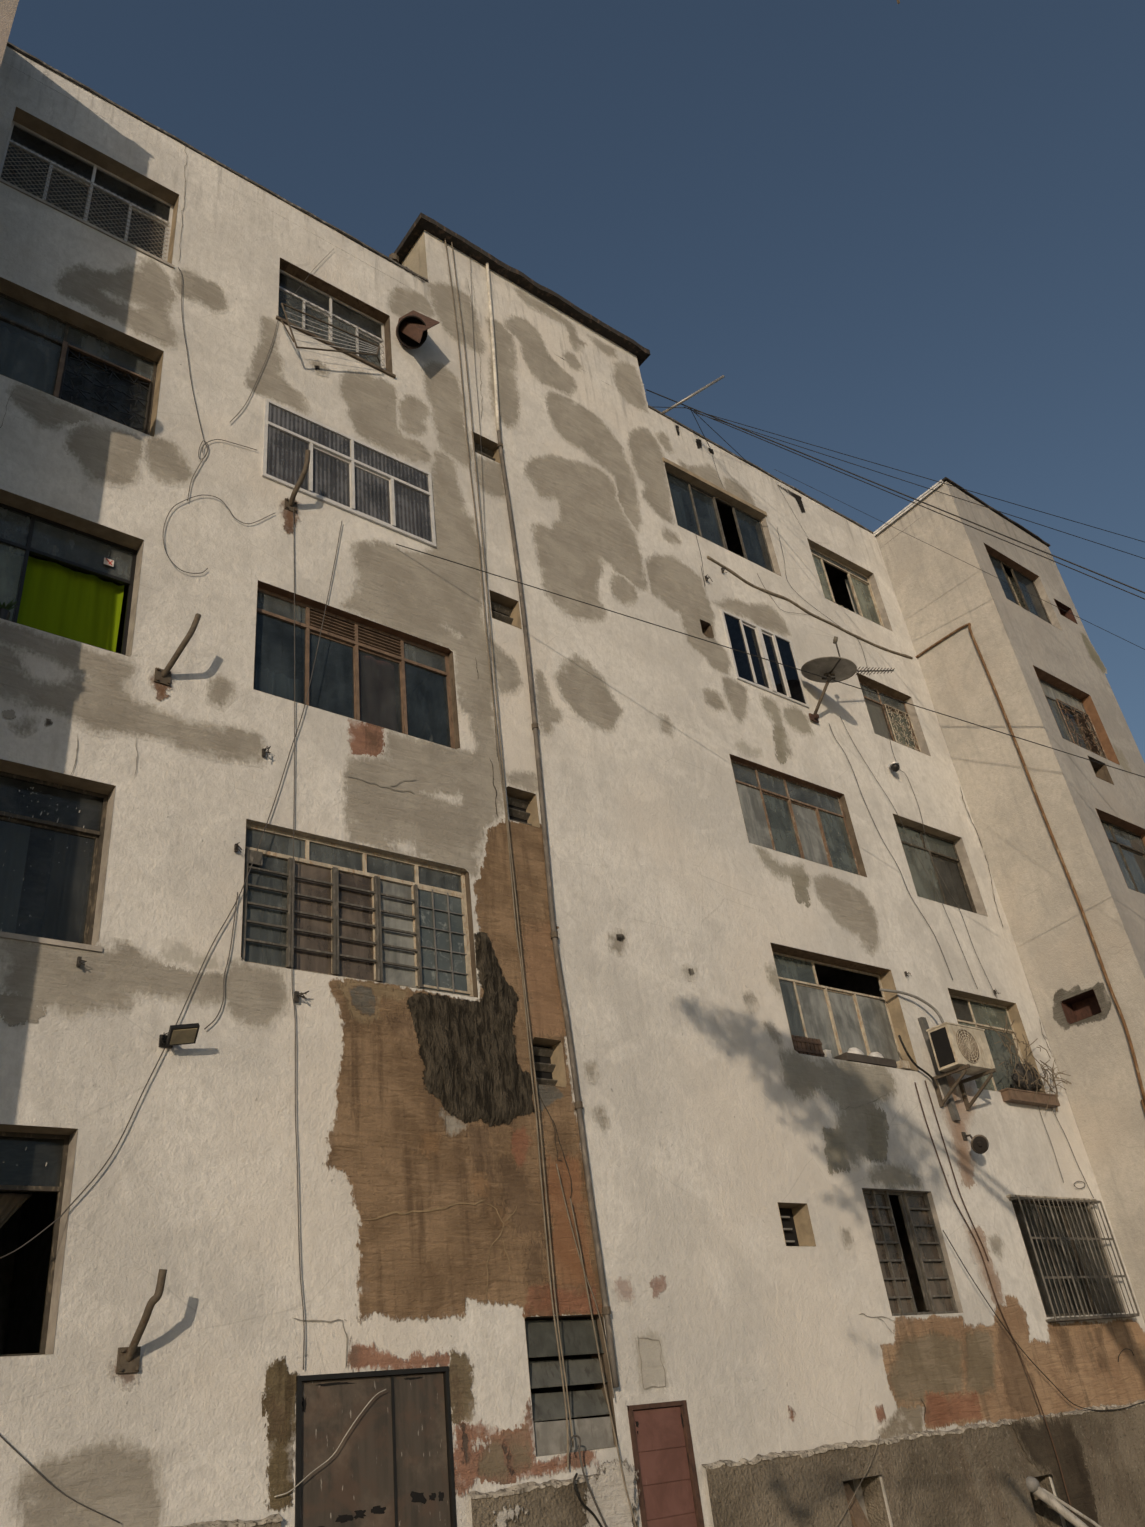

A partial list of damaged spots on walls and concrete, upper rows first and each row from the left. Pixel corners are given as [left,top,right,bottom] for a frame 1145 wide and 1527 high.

peeling [345,717,387,757]
peeling [322,818,668,1499]
damp [776,1044,924,1191]
peeling [261,1355,300,1514]
peeling [874,1294,1145,1431]